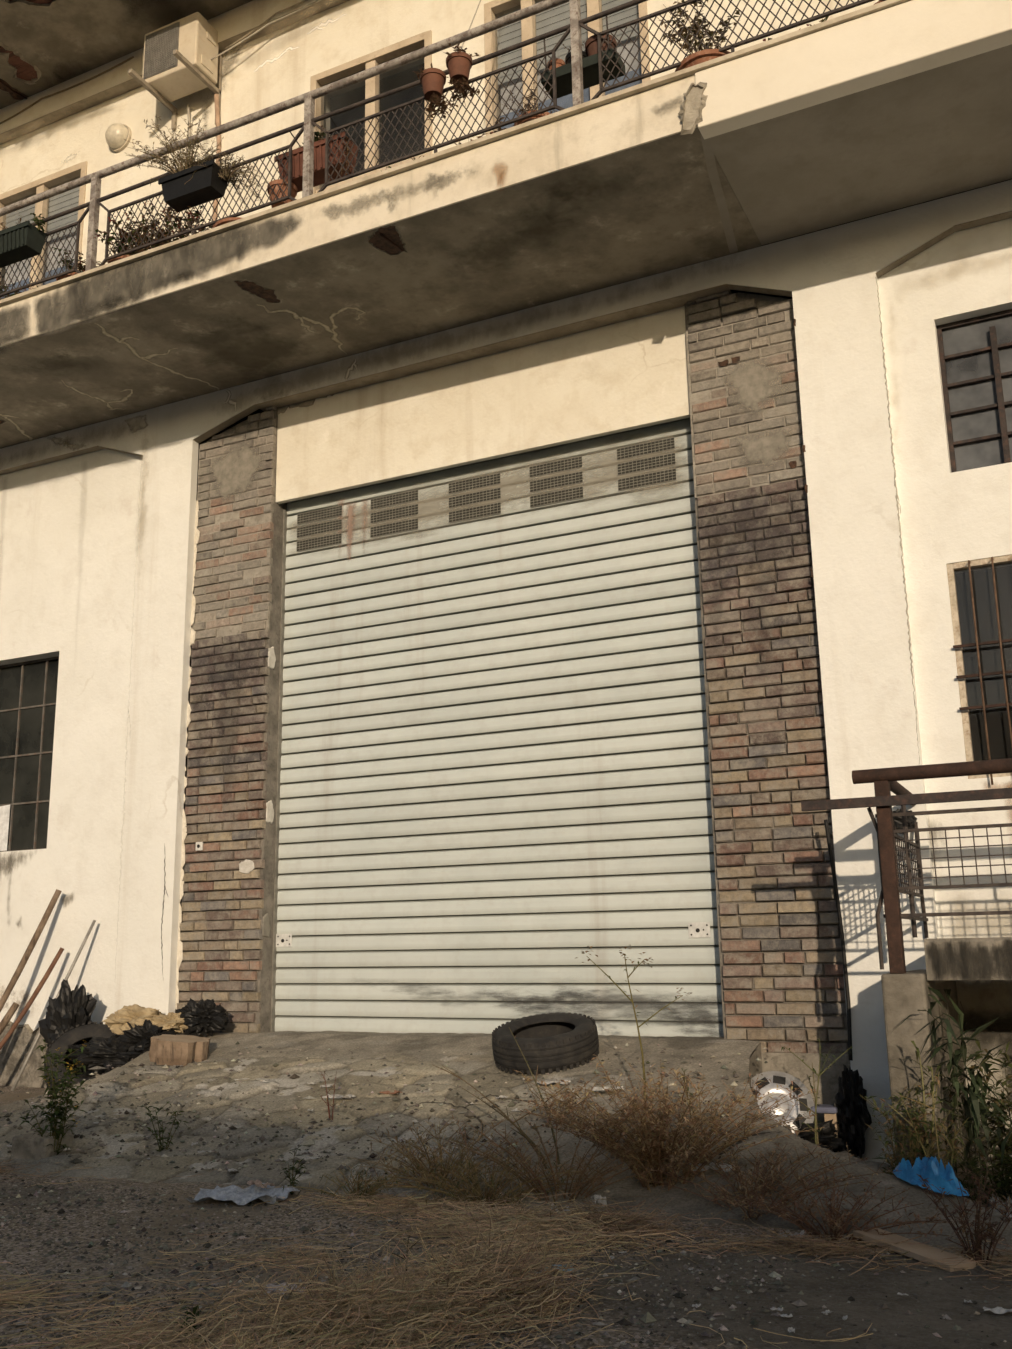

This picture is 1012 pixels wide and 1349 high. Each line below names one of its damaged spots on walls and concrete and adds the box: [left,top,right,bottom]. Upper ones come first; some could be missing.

spalling [1,0,73,9]
spalling [0,42,41,101]
spalling [657,82,708,135]
leakage [326,176,453,217]
spalling [367,224,407,256]
leakage [0,216,299,349]
spalling [233,279,282,303]
leakage [0,855,23,871]
leakage [928,940,1012,982]
leakage [963,1012,1012,1079]